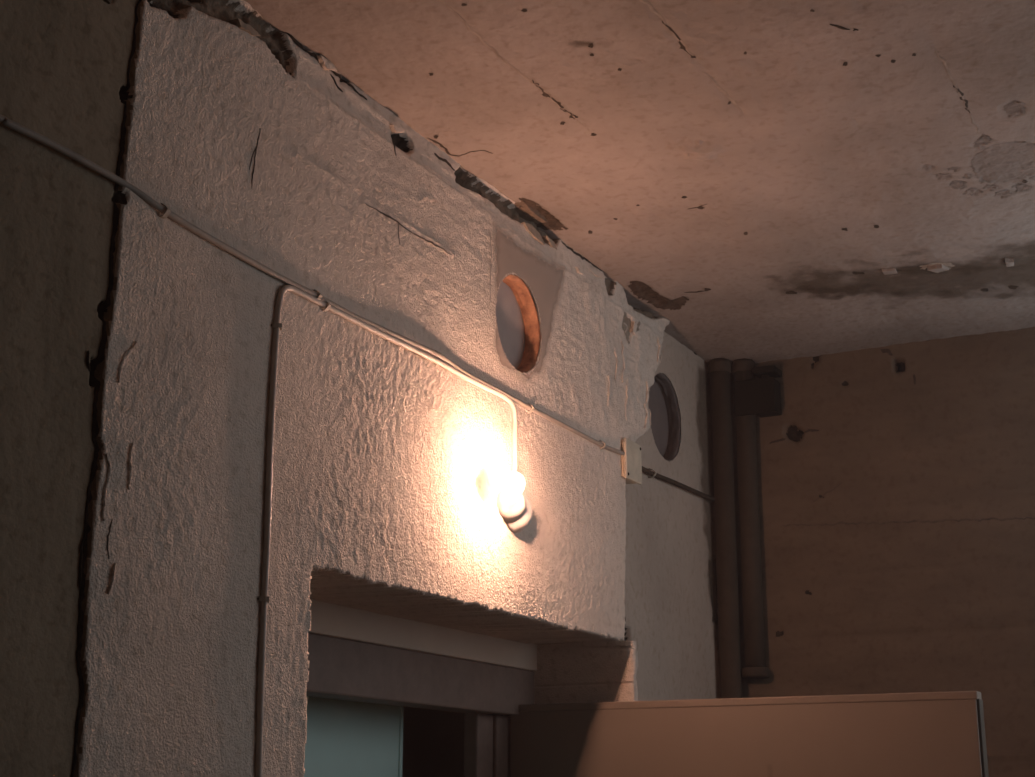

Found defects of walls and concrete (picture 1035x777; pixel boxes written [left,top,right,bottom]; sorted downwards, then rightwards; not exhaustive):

spalling [147,0,295,78]
crack [439,0,597,136]
crack [639,0,743,114]
crack [935,49,980,134]
spalling [389,124,413,155]
spalling [922,134,1035,199]
spalling [434,153,711,421]
water stain [797,245,1035,298]